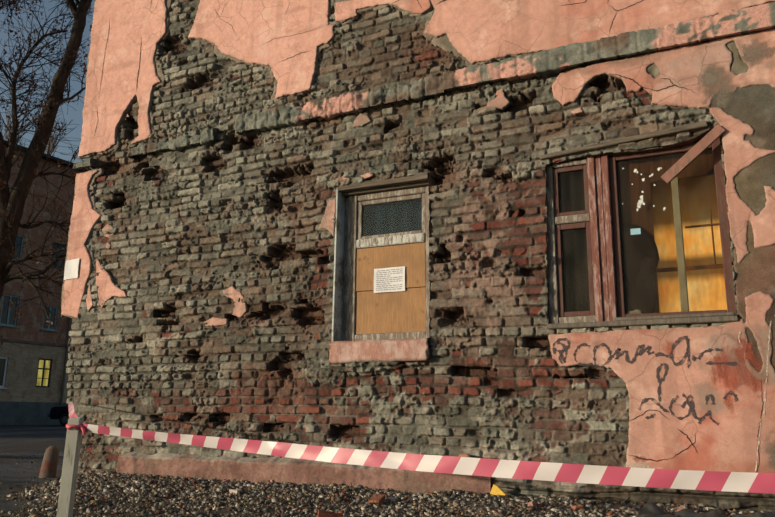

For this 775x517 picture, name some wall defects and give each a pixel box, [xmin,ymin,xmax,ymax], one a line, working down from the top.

damp [700,67,734,107]
peeling [726,41,749,75]
peeling [709,85,775,150]
peeling [733,153,775,215]
spalling [66,0,730,473]
peeling [726,197,775,372]
crack [627,410,697,462]